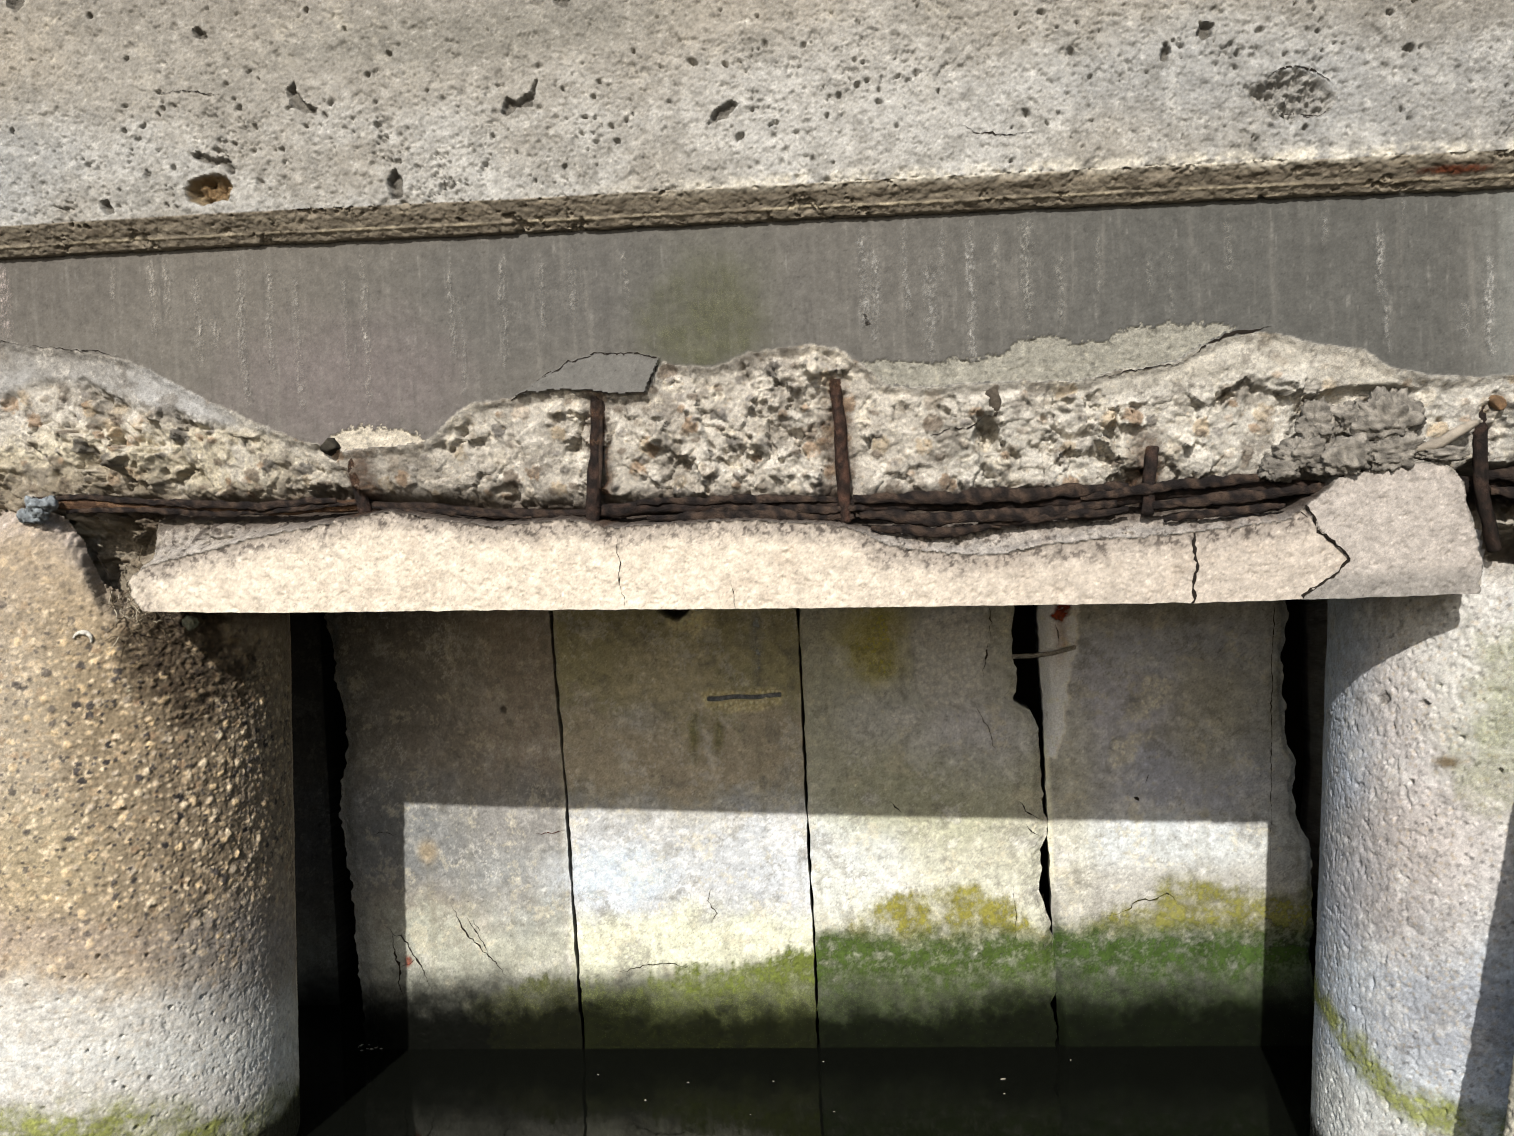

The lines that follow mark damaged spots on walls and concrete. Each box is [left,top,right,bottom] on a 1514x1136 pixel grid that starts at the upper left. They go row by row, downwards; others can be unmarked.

spalling [324,612,382,1048]
spalling [0,321,1514,969]
crack [1191,533,1199,603]
crack [1270,505,1350,871]